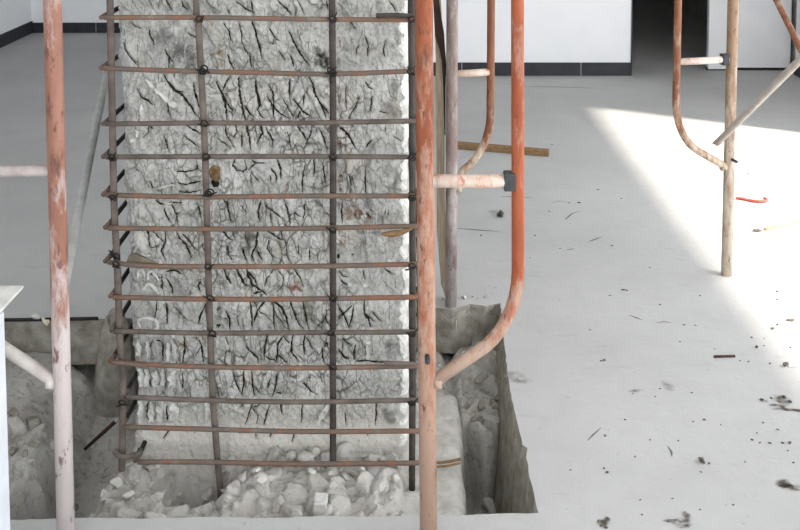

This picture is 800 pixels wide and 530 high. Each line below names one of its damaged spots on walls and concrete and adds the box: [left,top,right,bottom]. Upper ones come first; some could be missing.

peeling [145,79,177,108]
spalling [209,165,220,187]
spalling [397,0,409,359]
crack [132,0,388,438]
peeling [135,268,159,295]
peeling [137,316,159,330]
peeling [136,340,177,388]
peeling [137,401,179,425]
peeling [316,404,330,427]
spalling [398,369,409,447]